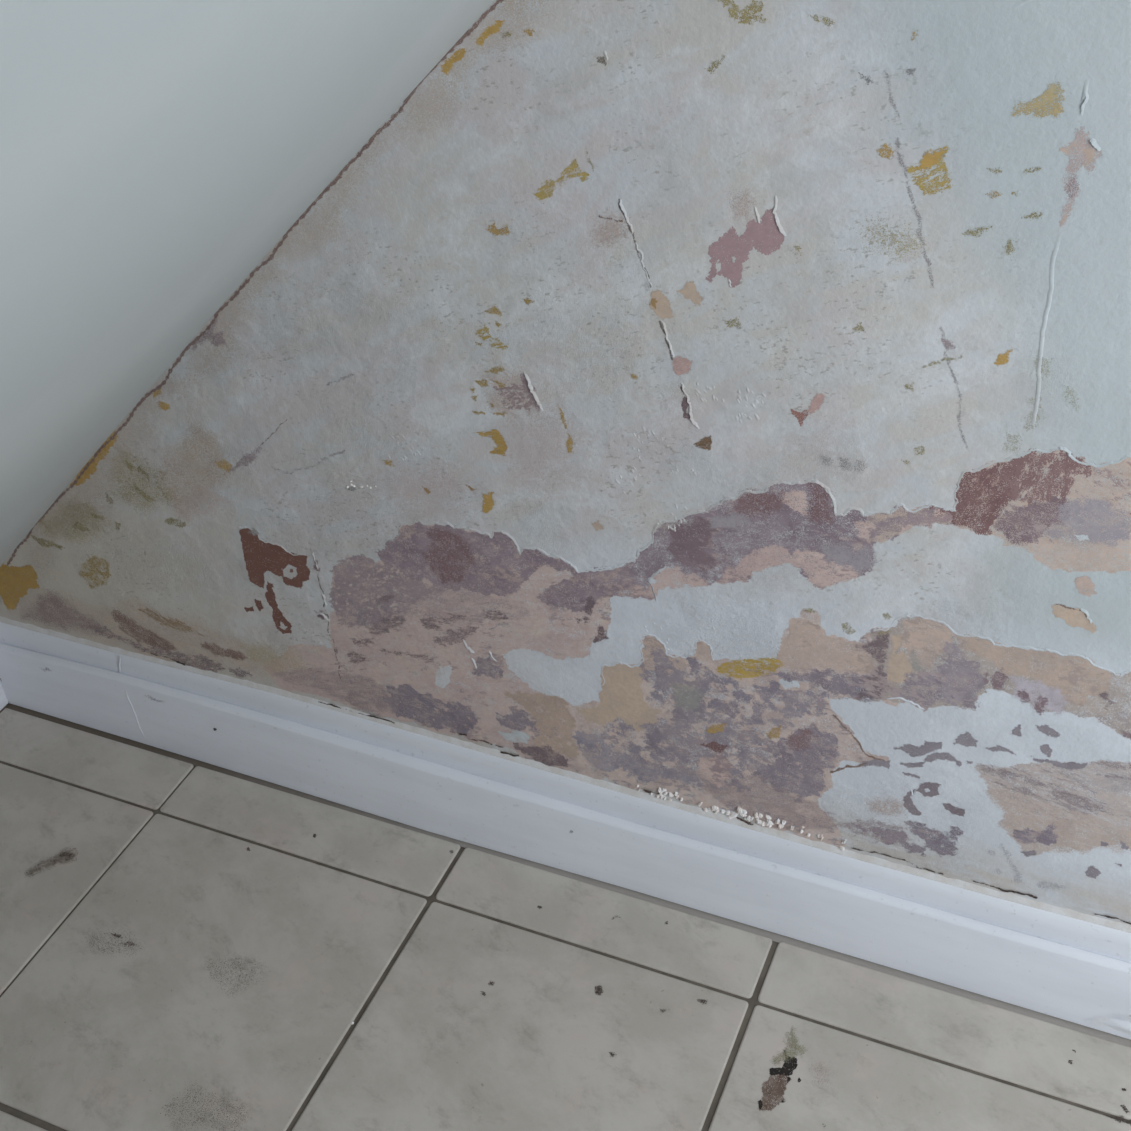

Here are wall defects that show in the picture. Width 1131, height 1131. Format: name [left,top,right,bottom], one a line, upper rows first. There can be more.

peeling [1059,126,1102,228]
peeling [705,187,786,288]
crack [589,199,712,450]
peeling [480,366,543,423]
spalling [791,393,826,427]
peeling [238,446,1131,879]